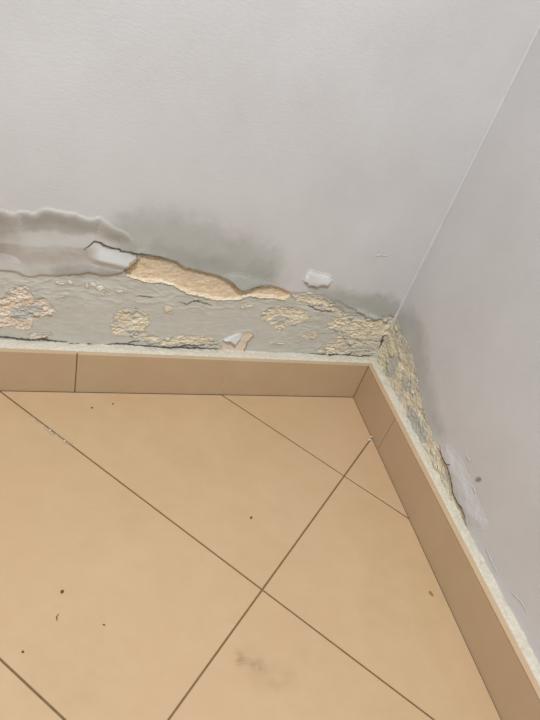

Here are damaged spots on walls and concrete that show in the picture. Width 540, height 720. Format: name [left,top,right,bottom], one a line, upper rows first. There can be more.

peeling [0,242,468,529]